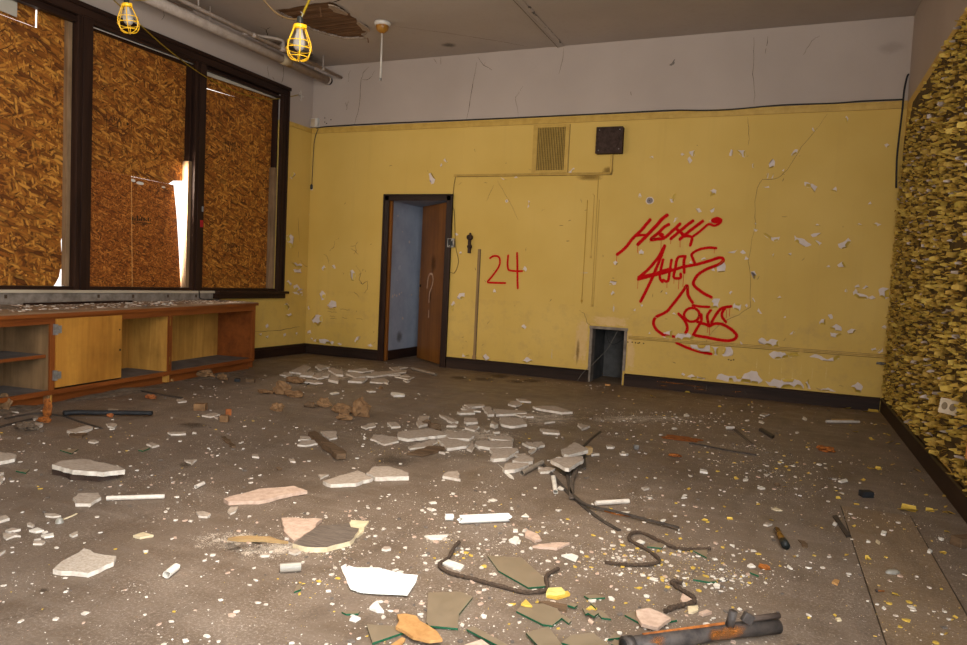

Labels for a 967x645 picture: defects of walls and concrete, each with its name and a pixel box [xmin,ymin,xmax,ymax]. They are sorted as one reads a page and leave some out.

flaking render [276,2,370,43]
peeling [689,250,748,272]
peeling [710,291,762,314]
peeling [283,291,342,345]
peeling [819,314,856,338]
peeling [663,330,742,356]
peeling [758,338,840,361]